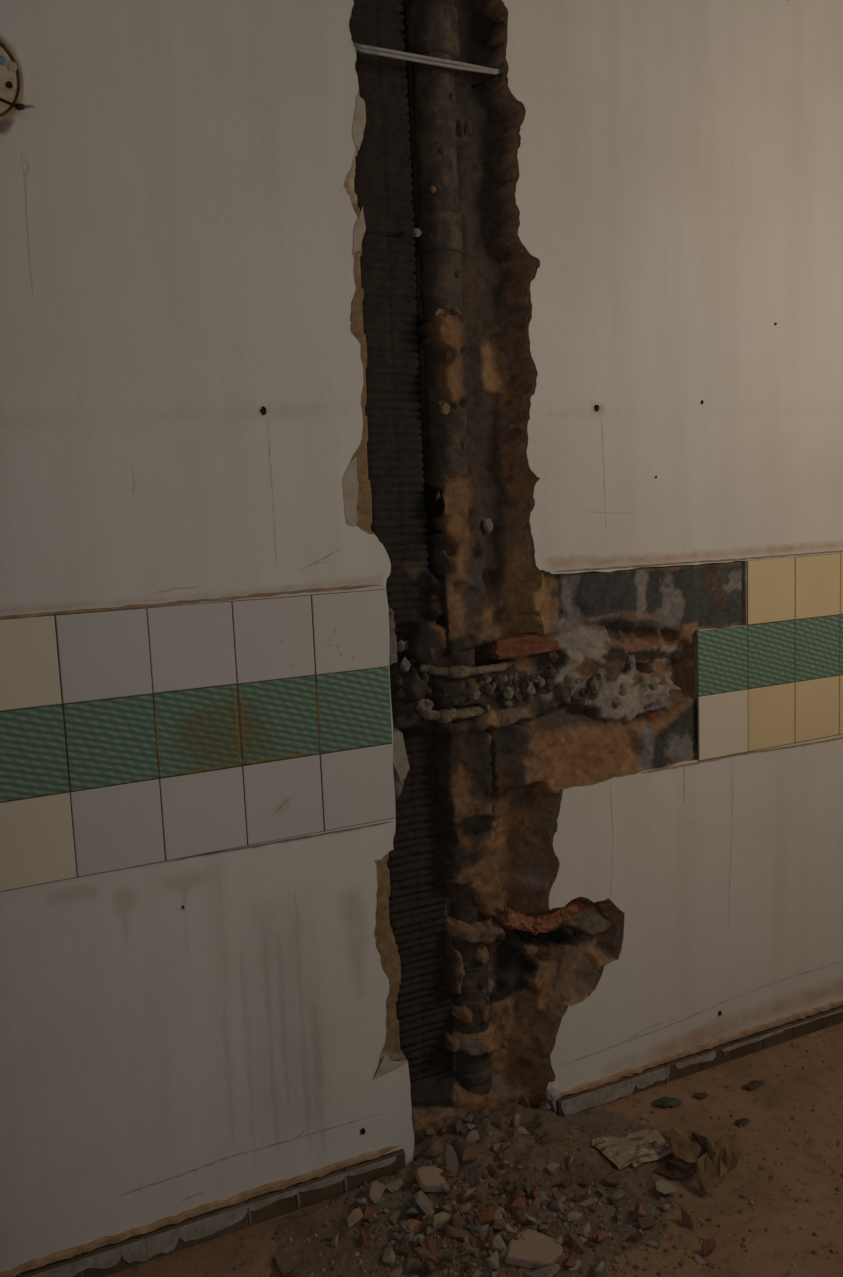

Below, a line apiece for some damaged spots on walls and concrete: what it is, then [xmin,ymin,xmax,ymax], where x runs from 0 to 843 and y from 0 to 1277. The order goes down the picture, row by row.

spalling [342,0,843,1140]
peeling [0,1146,399,1277]